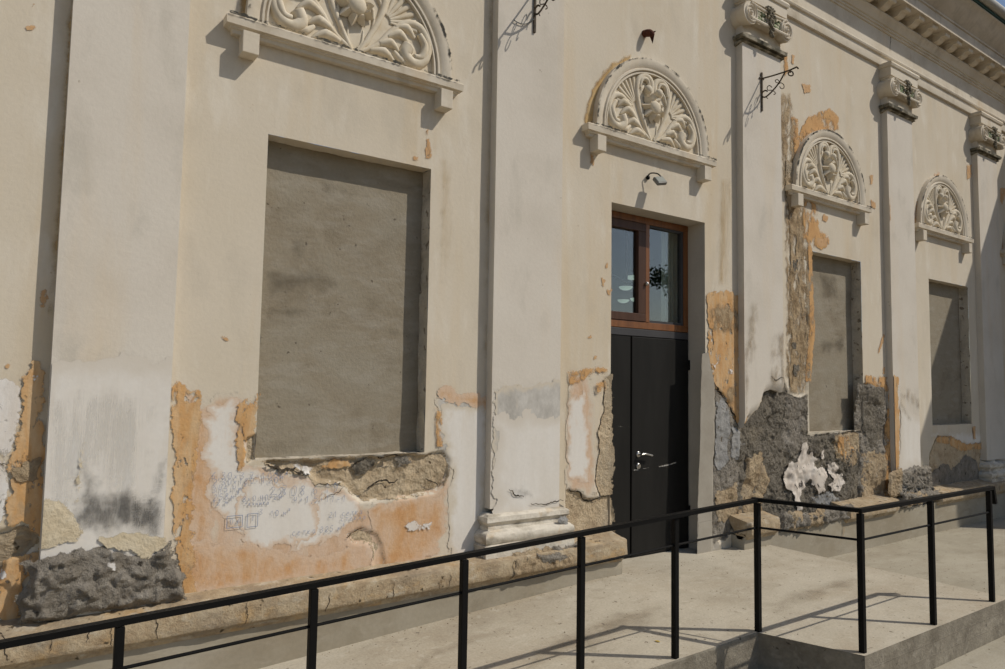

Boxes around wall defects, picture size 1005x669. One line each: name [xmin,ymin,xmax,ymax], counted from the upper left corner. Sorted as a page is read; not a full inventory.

peeling [799,108,839,144]
flaking render [706,160,982,544]
flaking render [0,360,219,625]
leakage [77,494,157,526]
flaking render [244,436,450,501]
flaking render [346,528,385,561]
peeling [406,521,432,531]
flaking render [509,374,616,580]